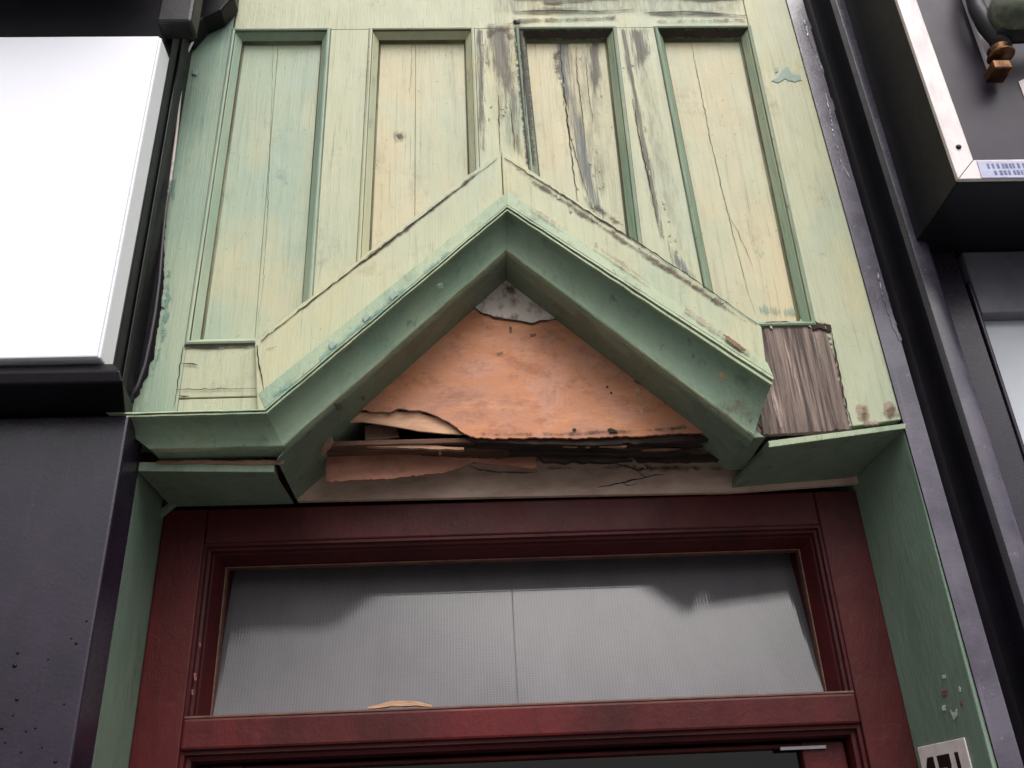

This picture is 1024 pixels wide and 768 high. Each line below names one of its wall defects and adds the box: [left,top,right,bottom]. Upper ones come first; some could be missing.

peeling [772,67,802,83]
peeling [685,309,899,437]
peeling [320,410,559,483]
crack [600,463,666,487]